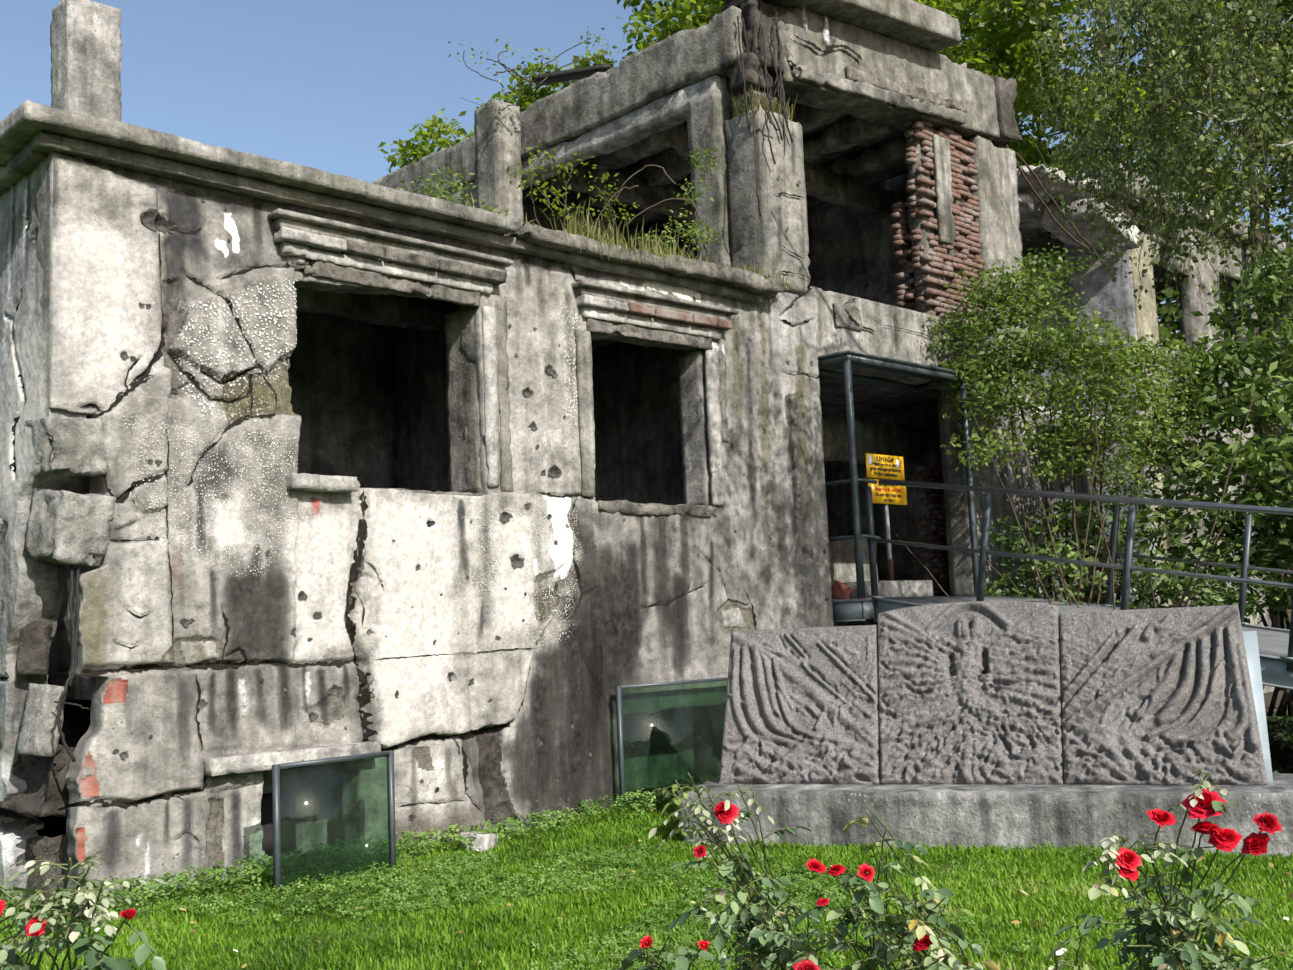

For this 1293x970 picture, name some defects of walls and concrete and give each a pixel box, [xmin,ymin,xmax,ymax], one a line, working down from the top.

crack [0,191,534,841]
water stain [209,545,327,729]
water stain [505,510,689,826]
flaking render [75,827,88,863]